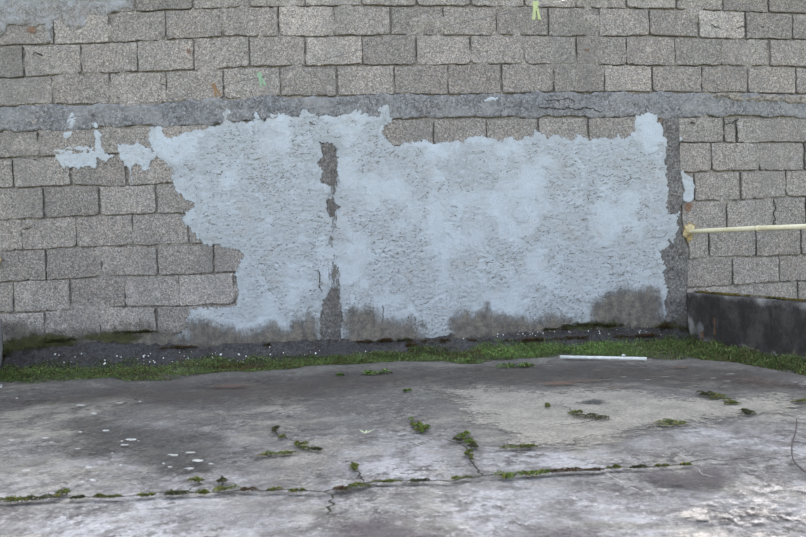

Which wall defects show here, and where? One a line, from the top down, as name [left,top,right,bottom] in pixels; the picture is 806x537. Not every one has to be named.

spalling [317,142,343,341]
damp [343,308,427,342]
damp [449,302,573,339]
damp [588,287,665,330]
damp [677,295,806,358]
crack [556,405,658,448]
crack [392,419,517,482]
crack [0,461,373,516]
crack [538,453,776,492]